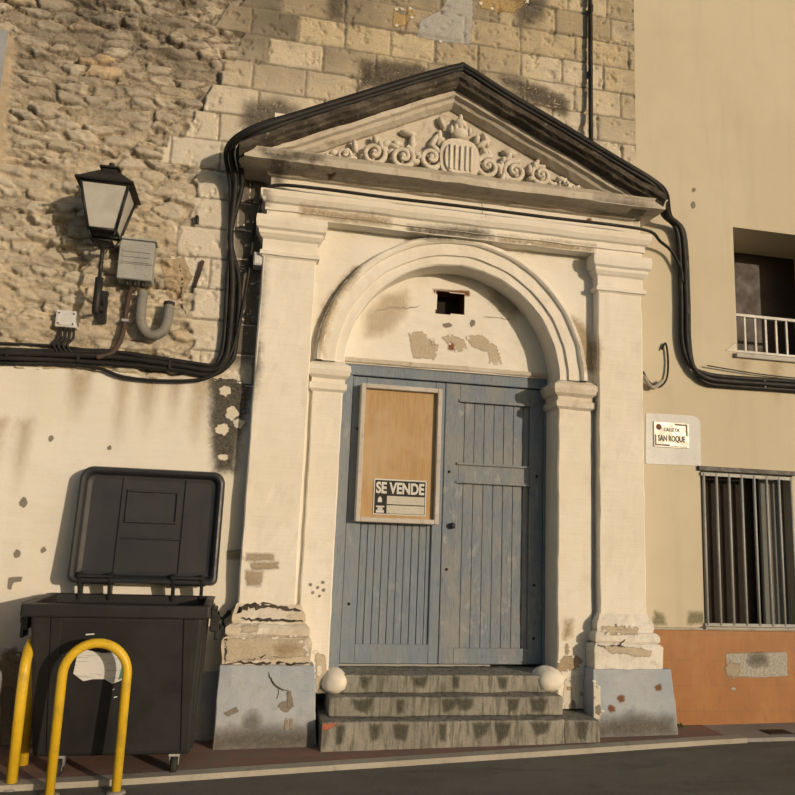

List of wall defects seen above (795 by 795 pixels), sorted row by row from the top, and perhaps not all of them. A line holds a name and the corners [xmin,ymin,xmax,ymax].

spalling [478,0,530,13]
peeling [409,320,502,365]
crack [214,602,309,698]
peeling [225,624,327,693]
peeling [725,652,788,691]